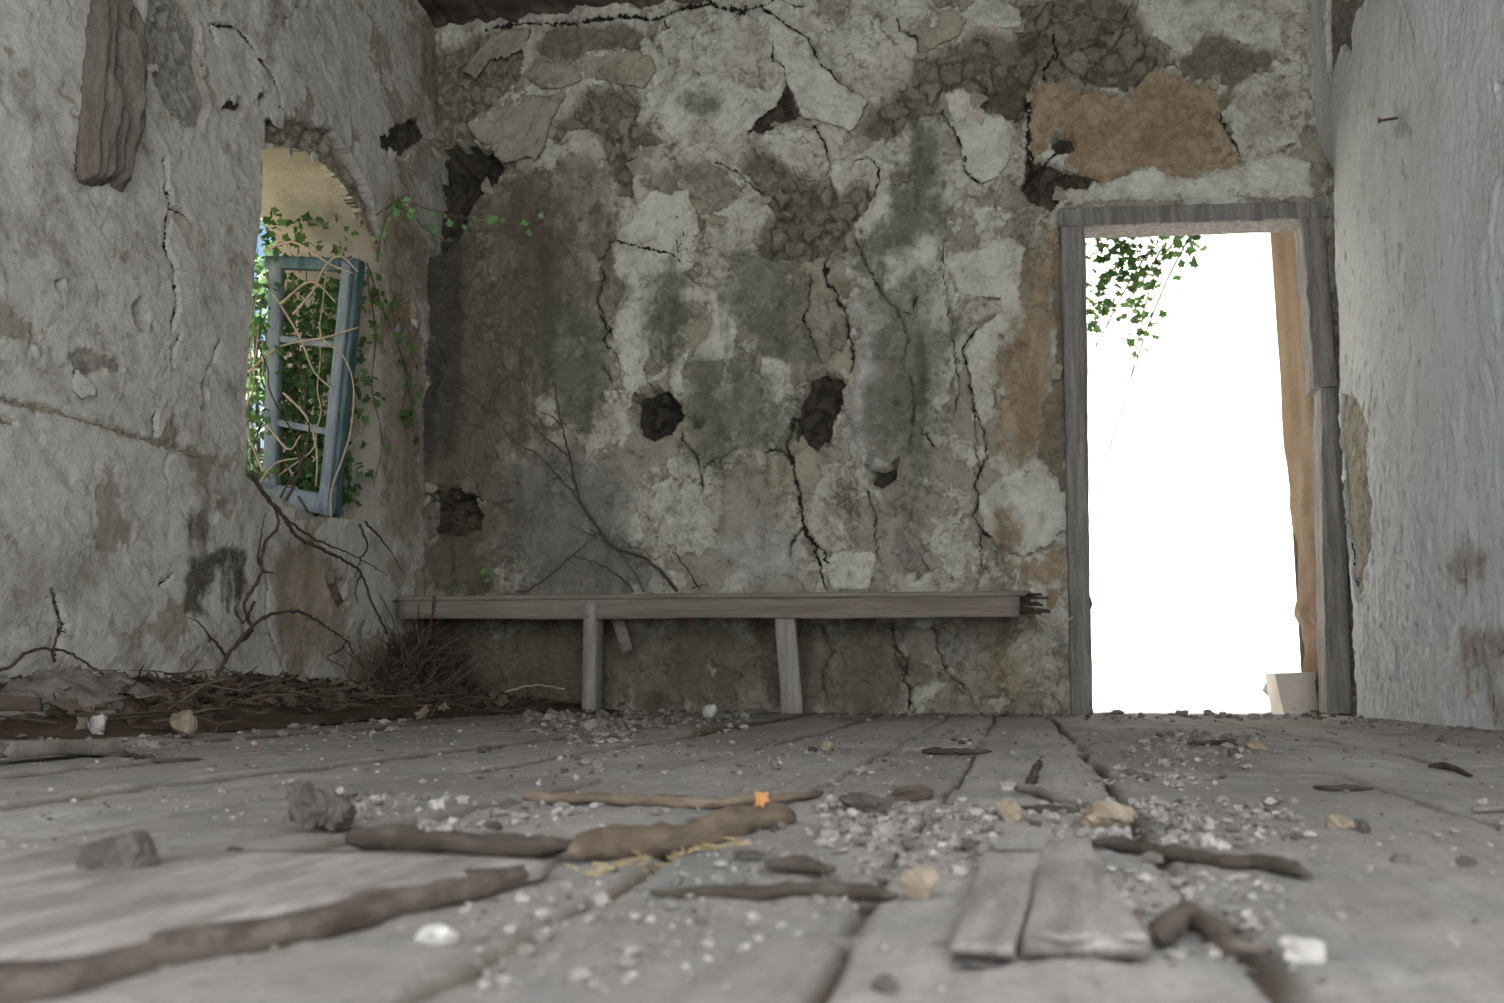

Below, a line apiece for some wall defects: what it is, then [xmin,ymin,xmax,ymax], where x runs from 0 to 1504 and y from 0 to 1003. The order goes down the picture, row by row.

spalling [1321,0,1365,84]
crack [715,162,773,209]
crack [812,125,881,196]
spalling [380,0,1315,453]
crack [941,109,984,195]
crack [1022,34,1059,200]
crack [596,216,702,387]
crack [681,235,1018,590]
leakage [851,261,884,476]
crack [442,493,512,506]
leakage [185,547,246,614]
crack [890,623,973,711]